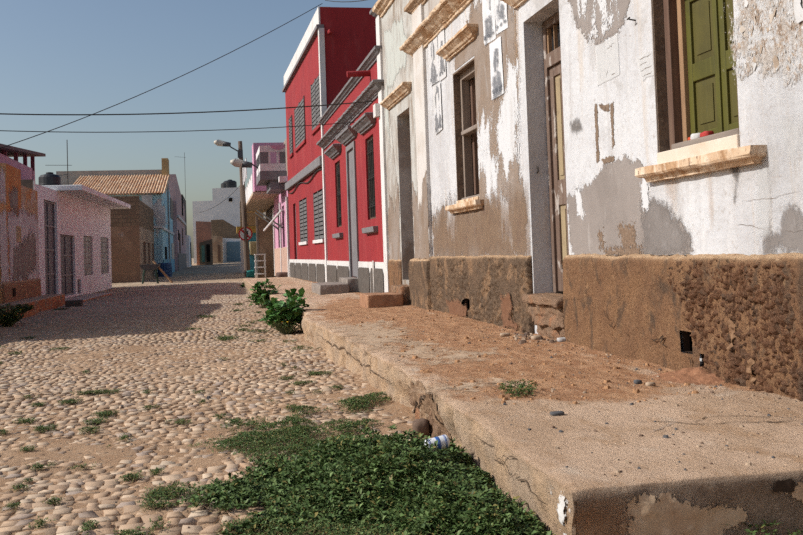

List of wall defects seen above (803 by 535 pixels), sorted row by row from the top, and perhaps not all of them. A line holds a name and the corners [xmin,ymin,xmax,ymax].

flaking render [567,0,631,45]
flaking render [727,0,803,87]
flaking render [418,0,530,260]
flaking render [0,169,39,288]
flaking render [567,154,803,401]
crack [644,415,803,432]
flaking render [619,492,747,535]
peeling [773,478,803,503]